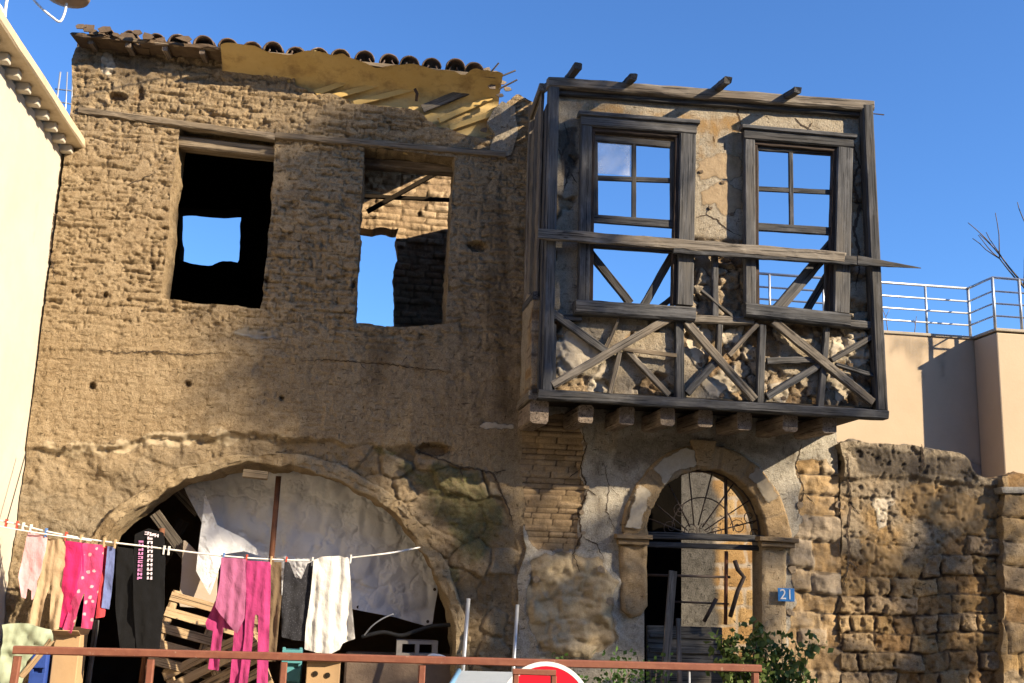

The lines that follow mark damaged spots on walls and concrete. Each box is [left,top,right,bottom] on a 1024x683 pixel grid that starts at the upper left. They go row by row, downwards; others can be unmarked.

crack [699,206,741,236]
flaking render [480,413,589,551]
crack [569,427,618,572]
flaking render [861,498,902,586]